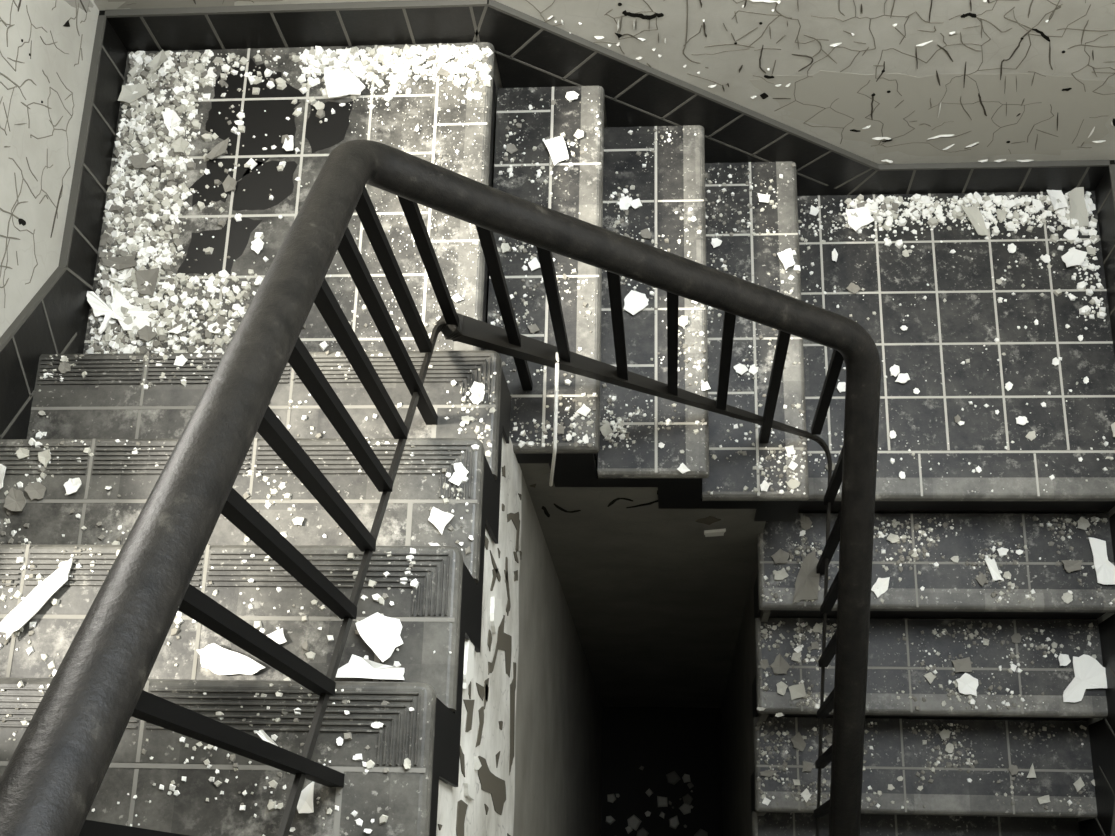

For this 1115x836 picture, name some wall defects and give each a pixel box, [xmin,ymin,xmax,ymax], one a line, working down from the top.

crack [0,0,87,288]
crack [605,0,1115,150]
flaking render [436,433,536,836]